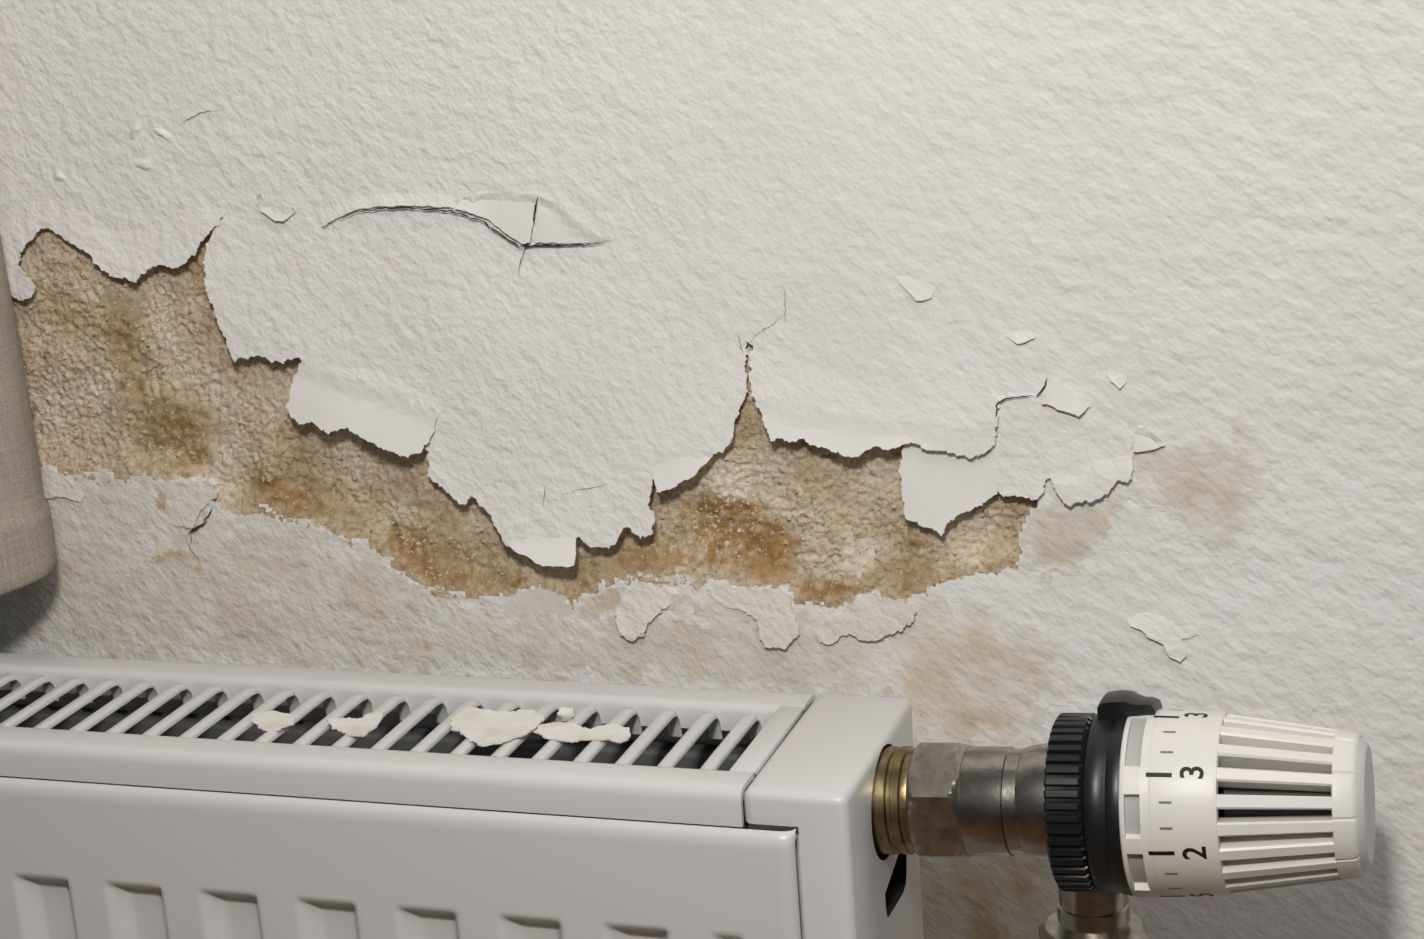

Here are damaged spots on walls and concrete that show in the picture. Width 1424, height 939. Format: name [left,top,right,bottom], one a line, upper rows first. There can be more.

crack [322,198,603,275]
peeling [0,186,1165,650]
water stain [0,458,1080,749]
peeling [1127,613,1199,662]
water stain [919,854,1059,939]